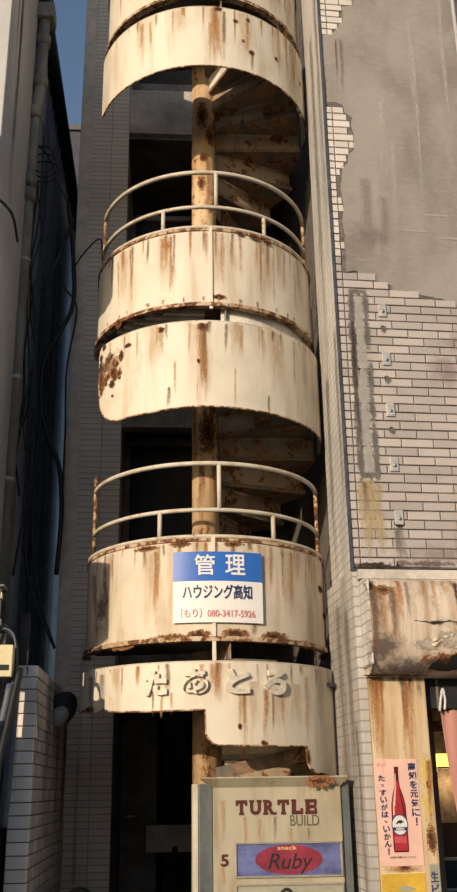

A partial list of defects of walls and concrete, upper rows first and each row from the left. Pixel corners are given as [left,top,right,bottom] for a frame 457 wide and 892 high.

corrosion [202,6,296,69]
corrosion [196,101,214,197]
spalling [322,0,457,306]
corrosion [203,231,295,281]
corrosion [197,321,210,386]
corrosion [199,466,217,499]
corrosion [104,541,259,602]
damp [354,526,455,569]
corrosion [150,623,288,644]
corrosion [363,581,409,659]
corrosion [369,677,383,745]
corrosion [401,677,414,734]